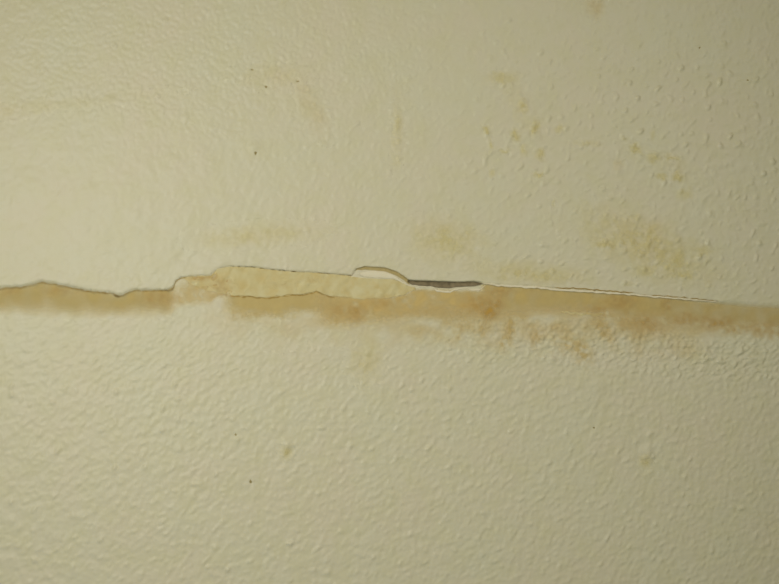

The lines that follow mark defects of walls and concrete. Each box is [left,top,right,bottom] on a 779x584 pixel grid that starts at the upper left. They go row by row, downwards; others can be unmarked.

crack [0,276,190,298]
crack [226,266,483,299]
leakage [322,290,494,323]
spalling [182,267,779,325]
crack [555,287,714,301]